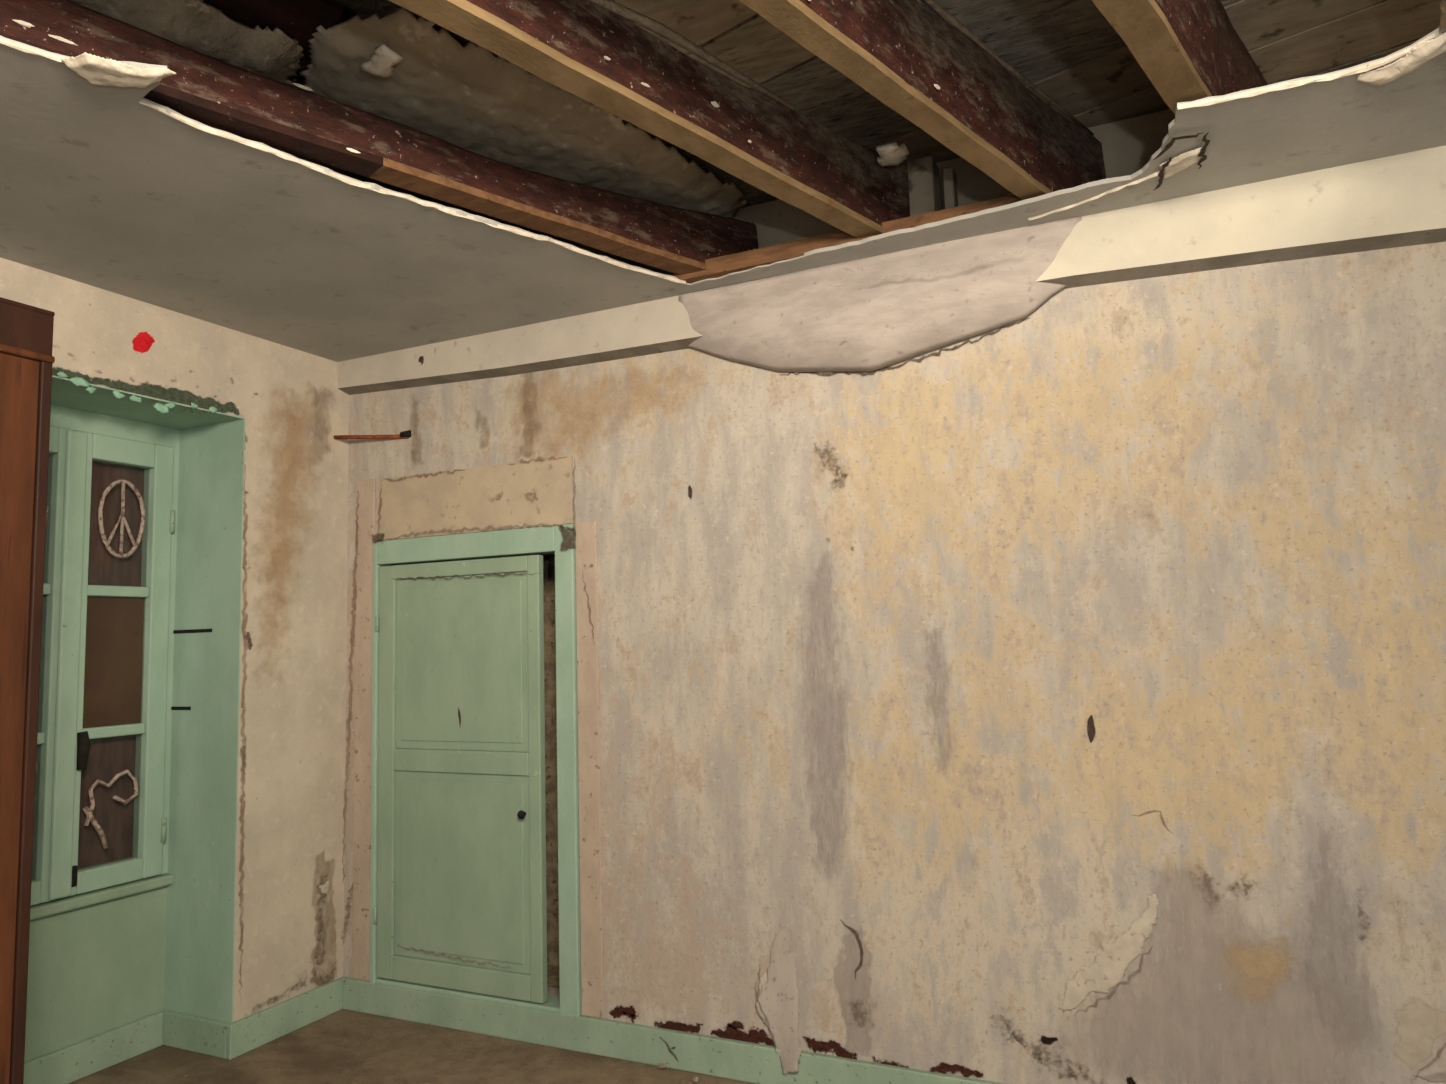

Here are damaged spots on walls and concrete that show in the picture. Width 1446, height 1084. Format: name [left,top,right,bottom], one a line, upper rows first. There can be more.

spalling [1177,0,1446,110]
spalling [0,0,747,284]
spalling [876,141,909,167]
spalling [1028,132,1210,221]
spalling [803,1036,909,1068]